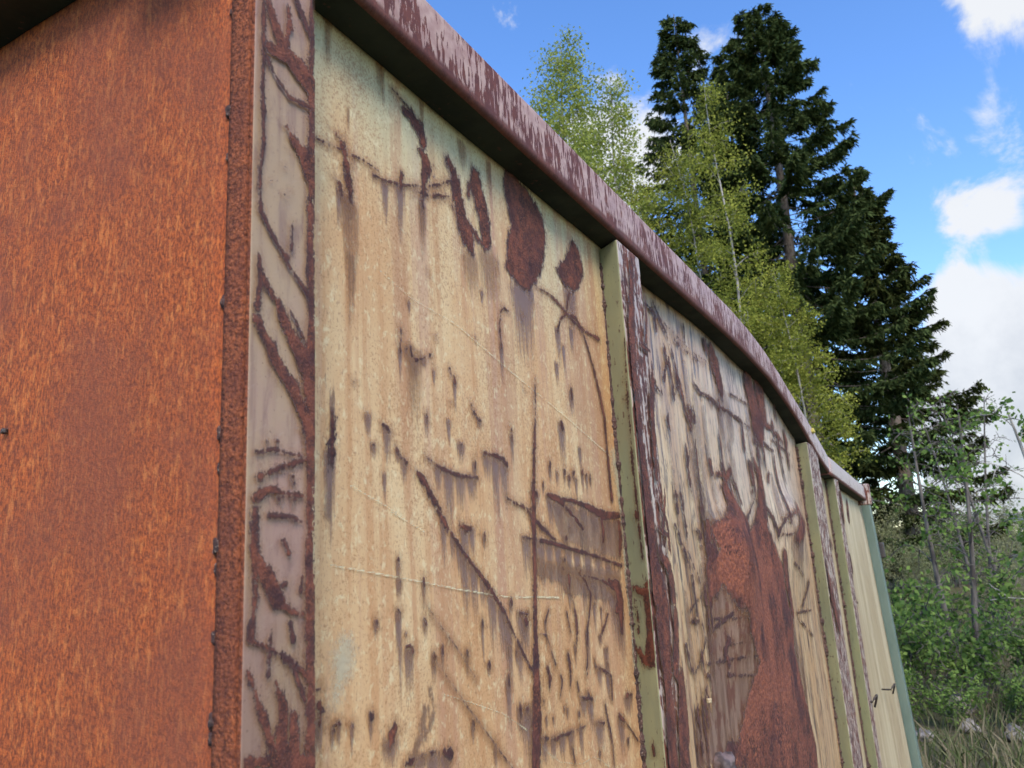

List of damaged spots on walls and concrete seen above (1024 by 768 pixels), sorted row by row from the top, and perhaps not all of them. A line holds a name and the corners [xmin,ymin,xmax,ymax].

rust [256,0,330,214]
rust [335,132,356,241]
rust [401,101,434,234]
rust [444,143,584,380]
rust [246,439,309,644]
rust [252,253,338,507]
rust [446,419,477,485]
rust [522,447,655,669]
rust [639,300,818,768]
rust [244,668,354,768]
rust [383,722,454,768]
rust [541,690,594,760]